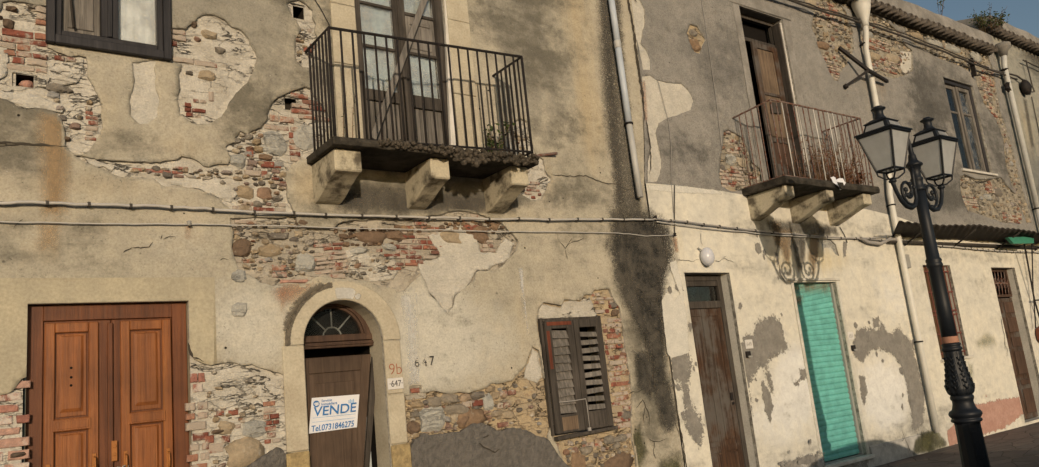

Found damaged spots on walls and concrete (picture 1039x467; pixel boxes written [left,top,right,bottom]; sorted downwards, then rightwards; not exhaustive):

spalling [0,1,517,312]
damp [599,0,678,432]
peeling [631,0,762,194]
spalling [804,0,1031,224]
spalling [0,379,30,467]
spalling [185,355,288,467]
spalling [404,289,635,467]
damp [633,430,647,464]
peeling [662,261,705,449]
peeling [741,313,791,423]
peeling [853,316,926,435]